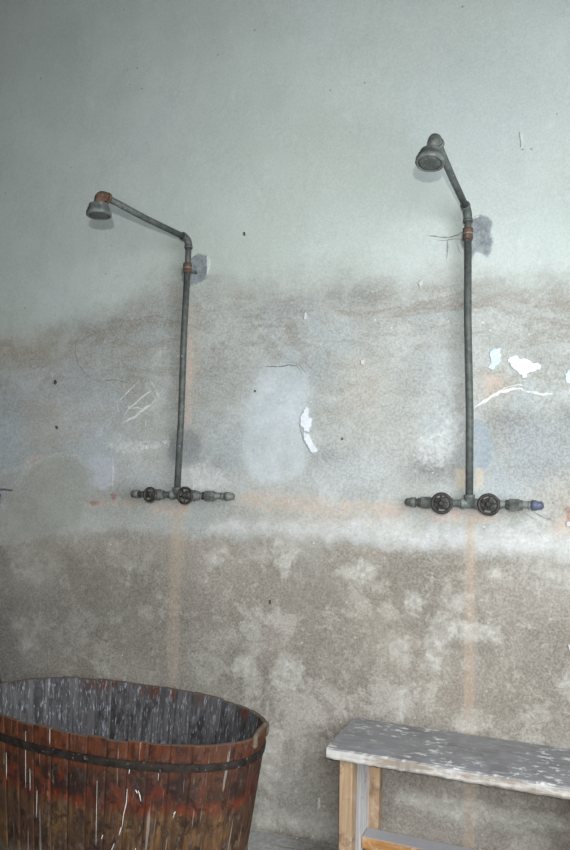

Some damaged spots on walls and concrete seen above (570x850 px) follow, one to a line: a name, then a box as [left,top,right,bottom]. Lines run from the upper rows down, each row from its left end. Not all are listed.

peeling [488,347,541,378]
crack [478,384,547,405]
peeling [300,407,318,453]